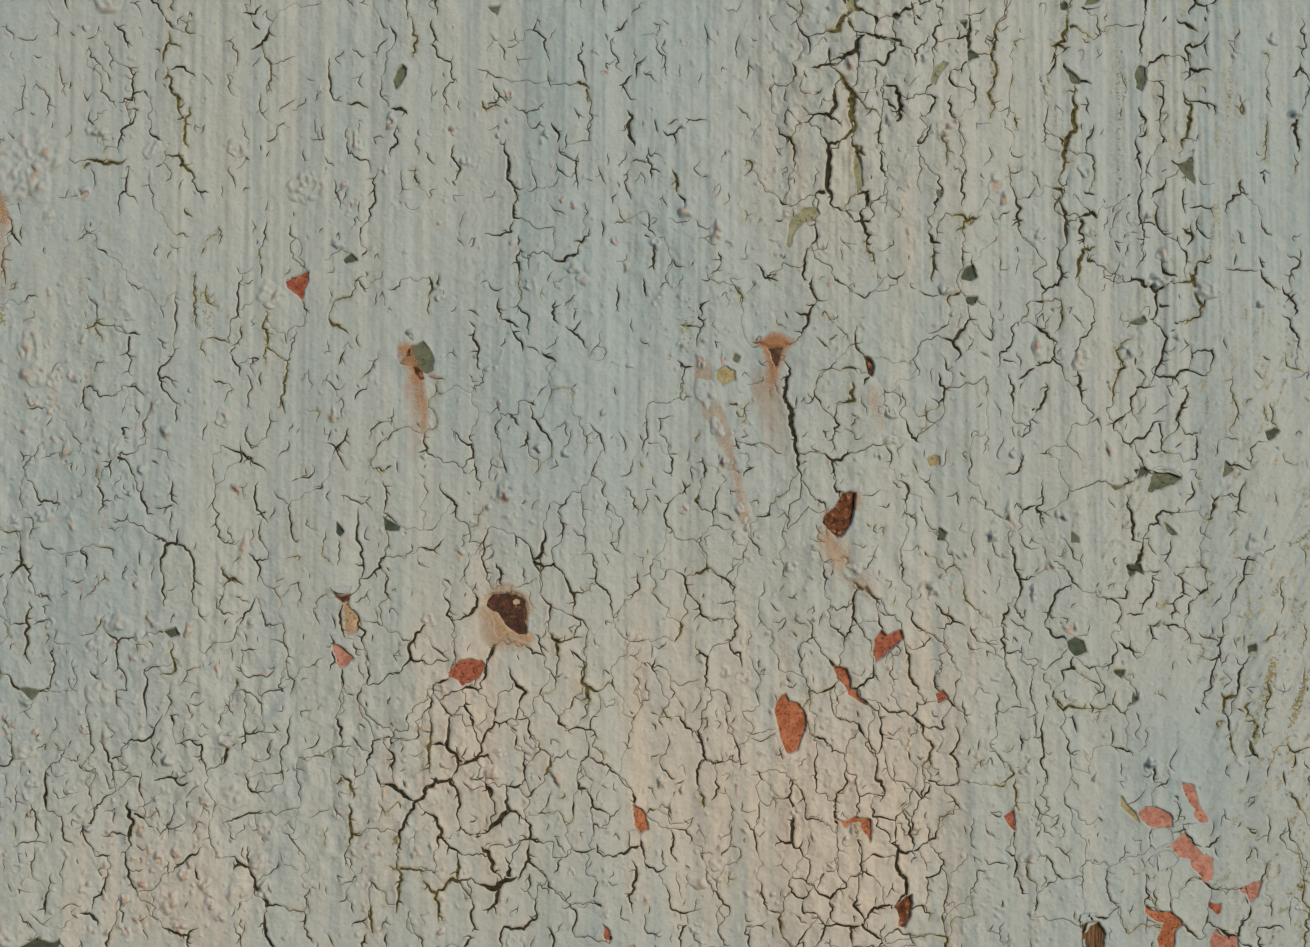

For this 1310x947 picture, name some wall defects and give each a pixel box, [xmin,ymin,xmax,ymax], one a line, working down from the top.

crack [1179,85,1217,156]
crack [1290,19,1310,175]
peeling [286,272,309,300]
crack [304,272,444,417]
corrosion [760,333,791,384]
peeling [823,493,855,538]
crack [108,514,209,622]
peeling [484,592,534,642]
peeling [873,630,903,661]
peeling [775,694,806,753]
crack [0,717,66,947]
peeling [1145,905,1182,947]